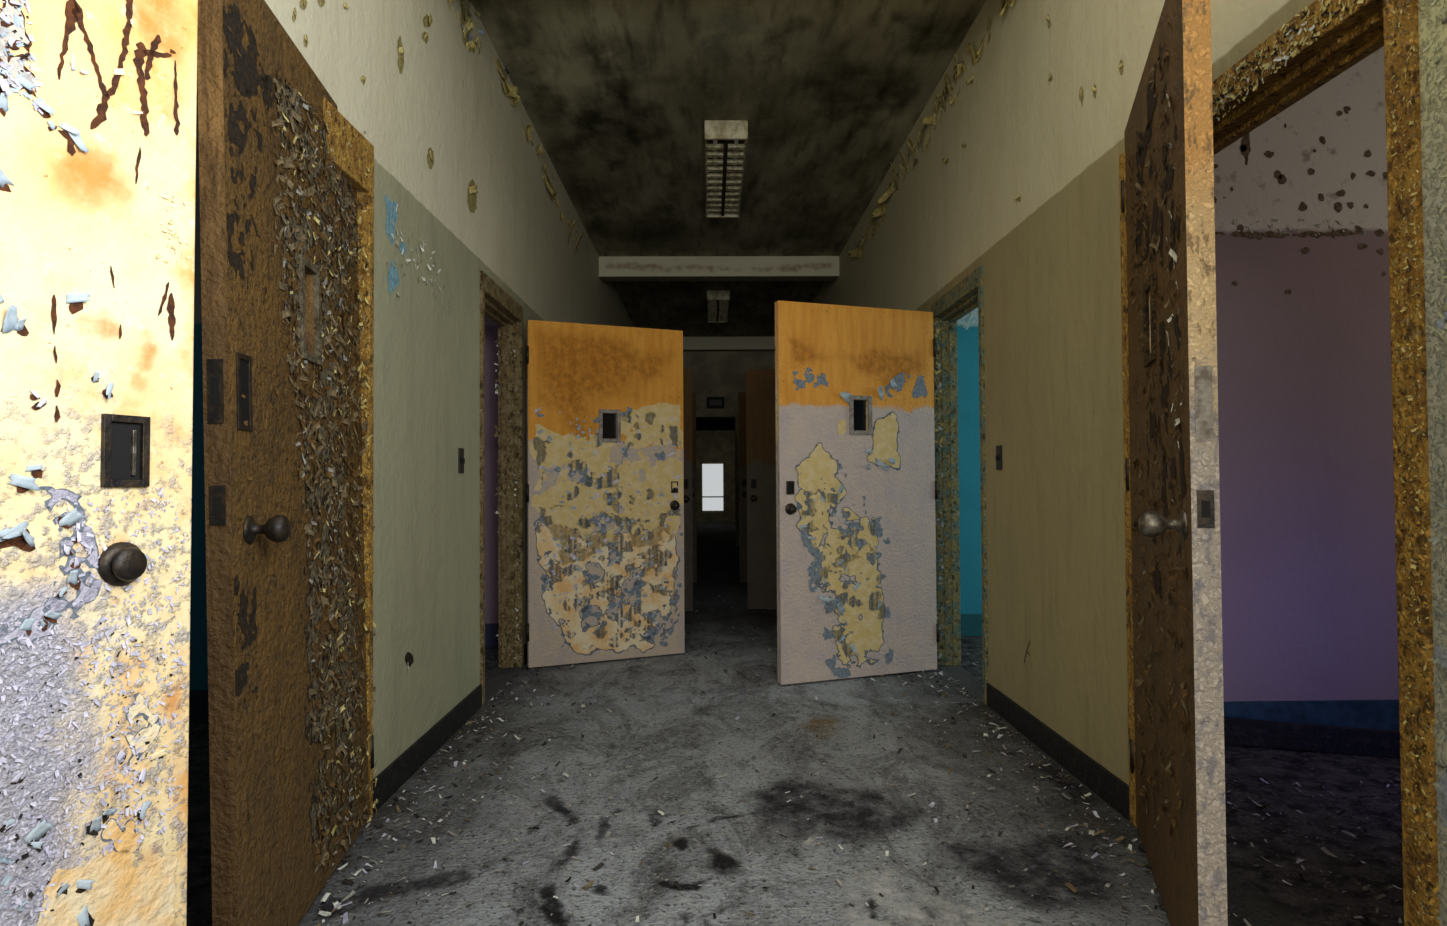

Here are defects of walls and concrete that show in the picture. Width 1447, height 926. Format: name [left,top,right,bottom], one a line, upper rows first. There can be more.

peeling [0,0,89,156]
peeling [0,168,14,192]
peeling [0,294,29,336]
peeling [30,390,47,411]
peeling [66,293,91,314]
peeling [91,371,114,399]
peeling [223,0,379,926]
peeling [495,402,683,660]
peeling [792,367,852,435]
peeling [795,442,894,678]
peeling [865,320,946,471]
peeling [0,465,188,926]